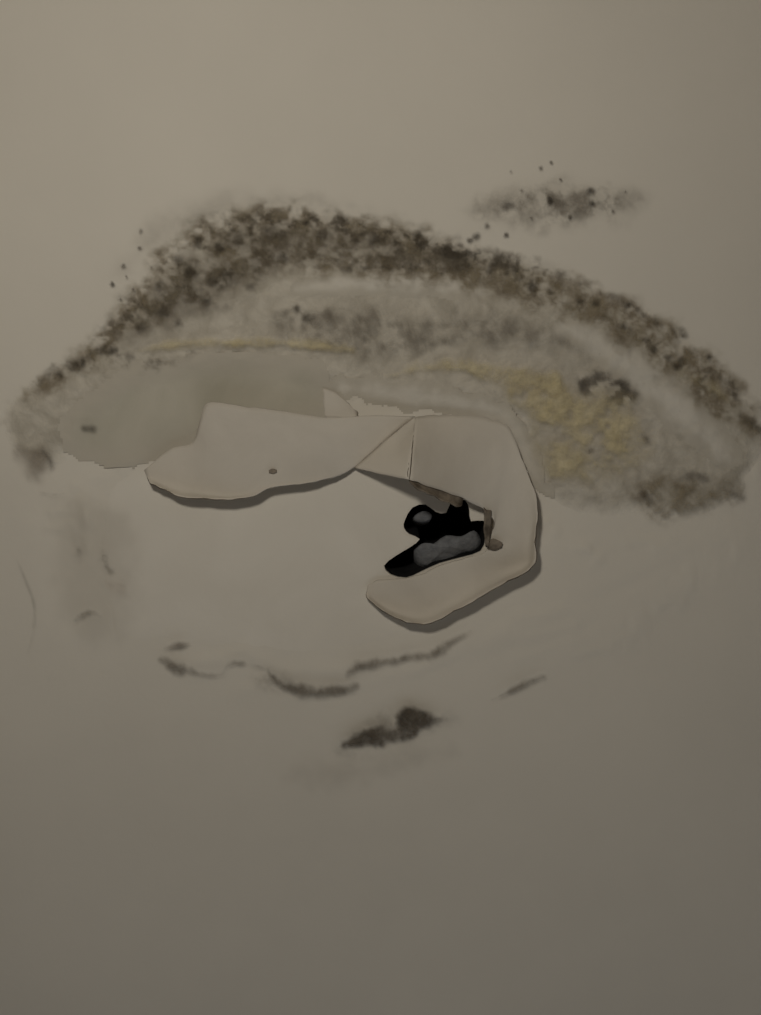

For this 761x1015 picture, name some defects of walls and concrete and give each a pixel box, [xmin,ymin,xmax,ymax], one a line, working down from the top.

water stain [190,206,330,279]
water stain [338,217,562,302]
water stain [75,268,207,365]
water stain [566,288,675,354]
water stain [58,340,346,469]
spalling [3,213,761,652]
water stain [444,362,635,476]
water stain [666,348,735,417]
mould [342,707,436,746]